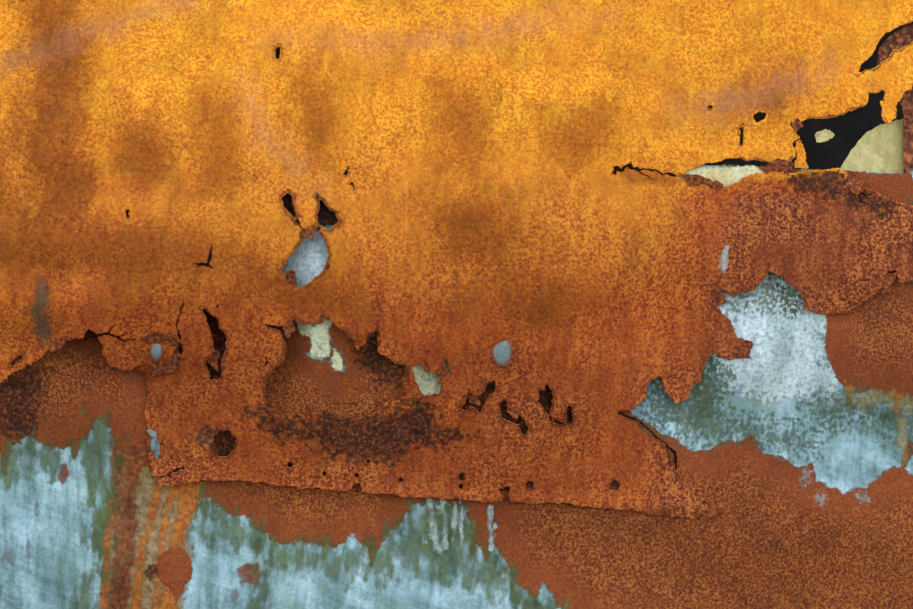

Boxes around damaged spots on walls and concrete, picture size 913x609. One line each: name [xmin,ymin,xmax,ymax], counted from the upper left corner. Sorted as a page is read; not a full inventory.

peeling [880,100,898,124]
peeling [679,104,865,190]
corrosion [282,193,296,217]
corrosion [313,200,339,227]
corrosion [780,169,913,220]
peeling [281,226,330,288]
corrosion [202,305,226,380]
peeling [283,317,343,371]
peeling [708,272,863,412]
corrosion [825,270,913,414]
peeling [412,359,449,395]
corrosion [0,320,913,609]